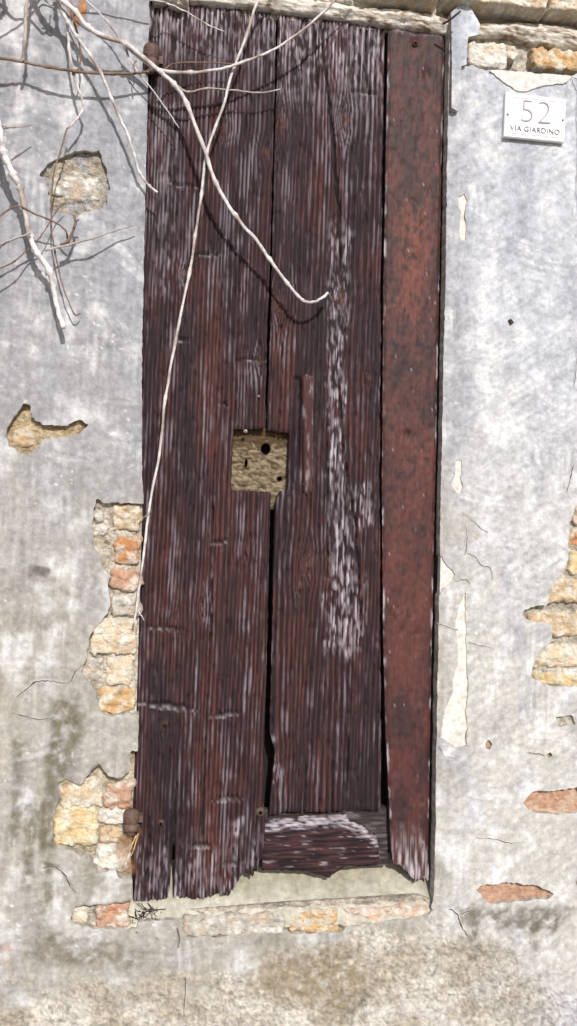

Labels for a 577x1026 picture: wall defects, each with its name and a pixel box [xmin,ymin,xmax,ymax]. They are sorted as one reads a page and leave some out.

spalling [41,152,110,216]
spalling [7,404,88,454]
peeling [451,460,462,493]
spalling [82,499,144,715]
peeling [437,556,454,594]
spalling [522,506,577,687]
peeling [439,593,473,758]
spalling [52,751,136,875]
spalling [523,788,577,813]
spalling [71,901,131,928]
spalling [477,882,552,903]